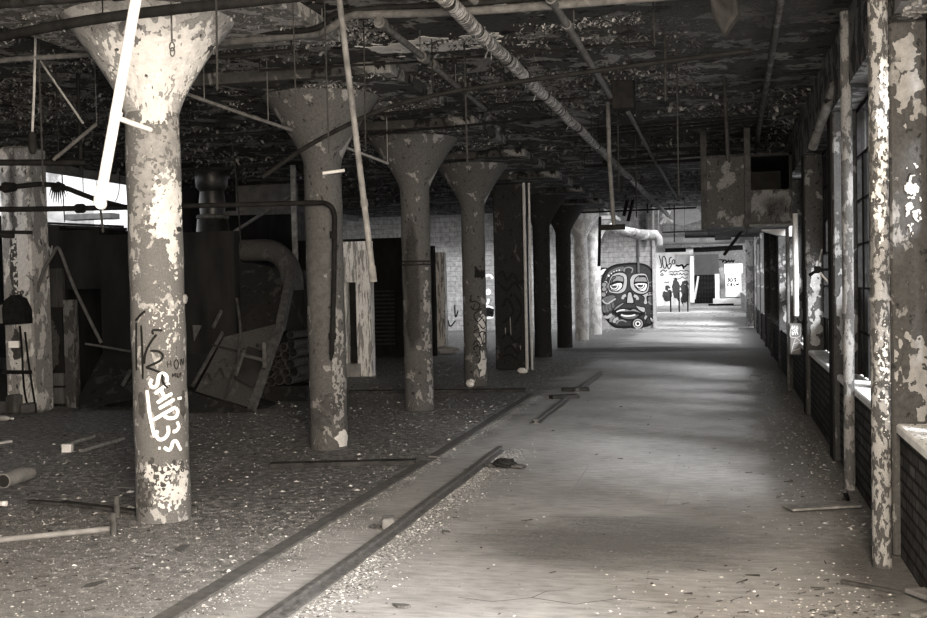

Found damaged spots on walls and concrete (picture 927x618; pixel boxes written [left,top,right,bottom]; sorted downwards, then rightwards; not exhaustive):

peeling [902,0,927,19]
peeling [0,5,811,300]
peeling [871,32,925,255]
peeling [11,323,32,364]
peeling [149,296,183,357]
peeling [307,229,348,447]
peeling [422,267,434,405]
spalling [662,278,689,306]
peeling [779,254,824,346]
peeling [875,315,927,439]
peeling [137,456,190,517]